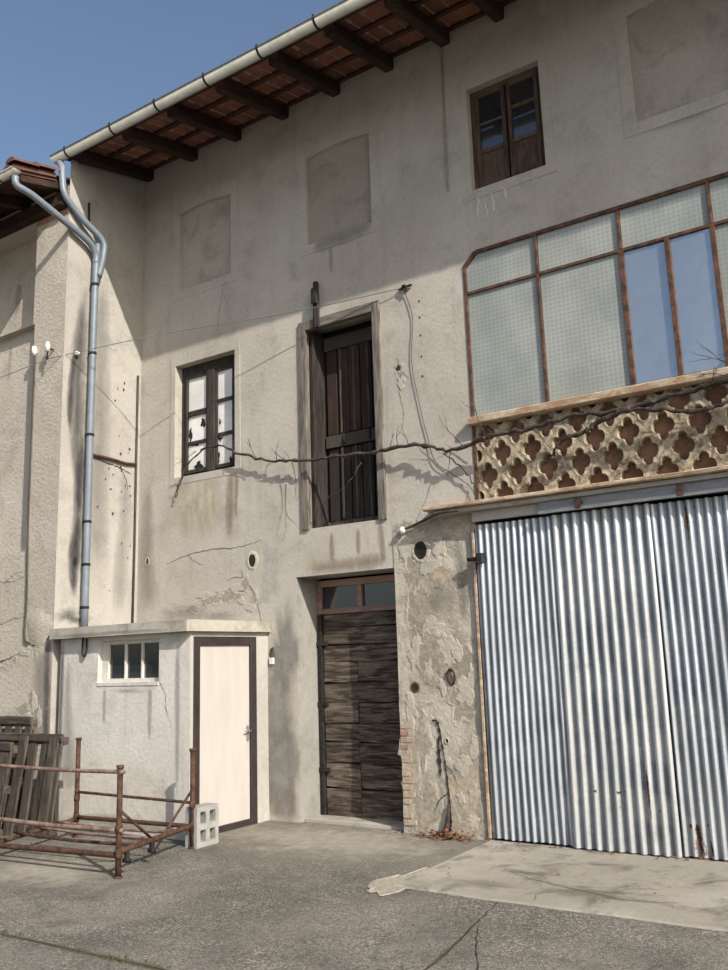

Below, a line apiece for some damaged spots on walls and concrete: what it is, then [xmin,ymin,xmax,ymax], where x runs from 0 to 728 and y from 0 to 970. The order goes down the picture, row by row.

leakage [69,316,83,587]
crack [168,540,260,565]
spalling [186,551,259,615]
spalling [394,517,493,841]
rust [690,824,714,860]
crack [473,927,481,970]